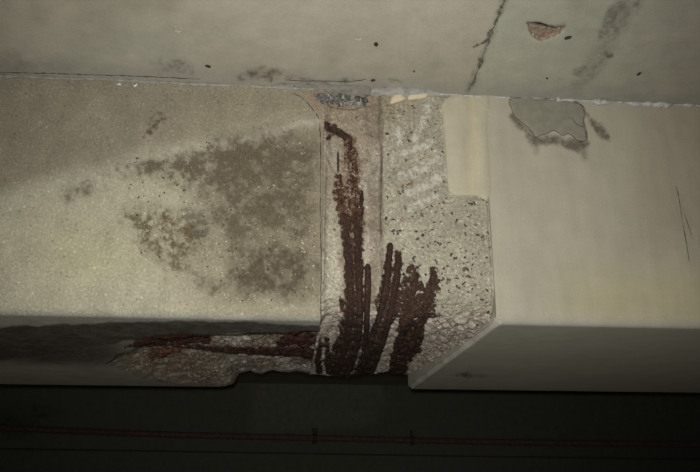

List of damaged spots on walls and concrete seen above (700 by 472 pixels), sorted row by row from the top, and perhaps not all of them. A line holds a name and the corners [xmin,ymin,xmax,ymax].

crack [469,1,505,90]
spalling [527,22,565,41]
water stain [127,160,164,174]
water stain [169,138,312,237]
water stain [131,210,202,269]
water stain [230,248,306,291]
corrosion [125,121,441,379]
spalling [108,94,494,387]